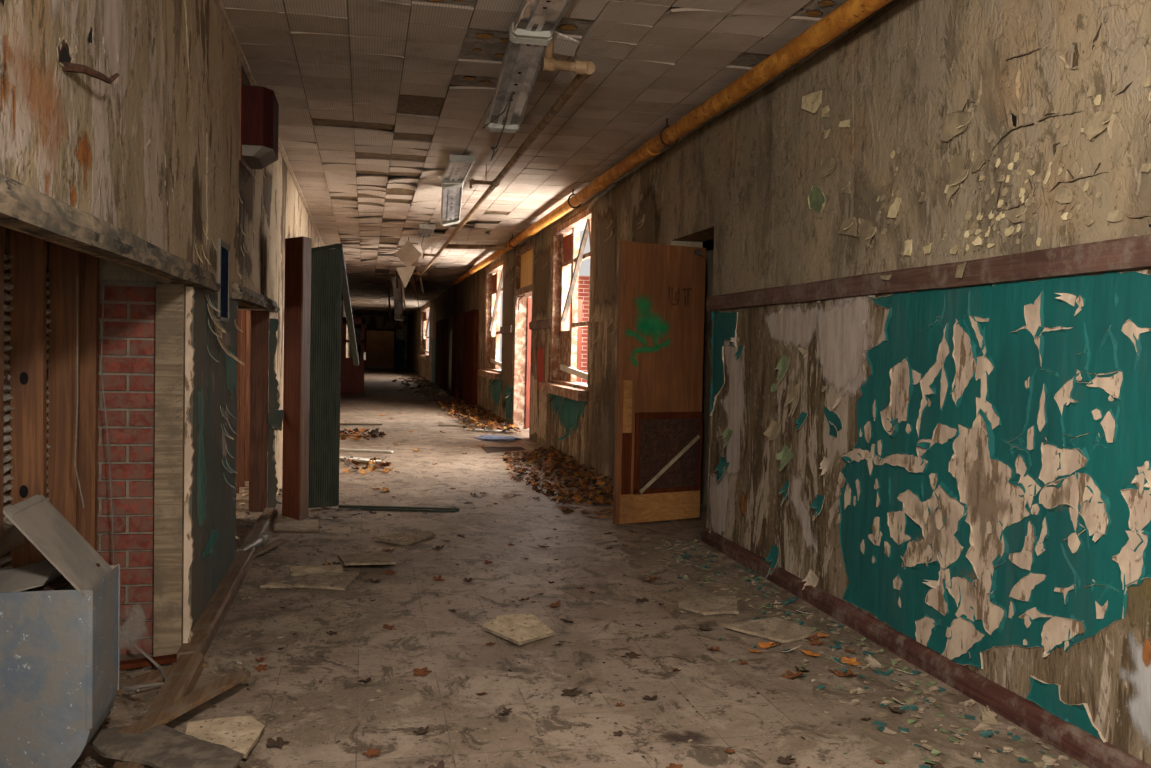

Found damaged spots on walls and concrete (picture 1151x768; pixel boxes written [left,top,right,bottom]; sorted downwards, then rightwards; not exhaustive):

peeling [459,26,509,62]
peeling [793,0,847,18]
corrosion [1,35,16,139]
flaking render [801,90,850,139]
corrosion [70,133,91,207]
peeling [311,90,445,221]
peeling [434,211,509,230]
flaking render [950,212,1016,278]
peeling [765,294,876,409]
peeling [1010,290,1086,366]
peeling [838,314,1151,661]
peeling [613,336,1077,768]